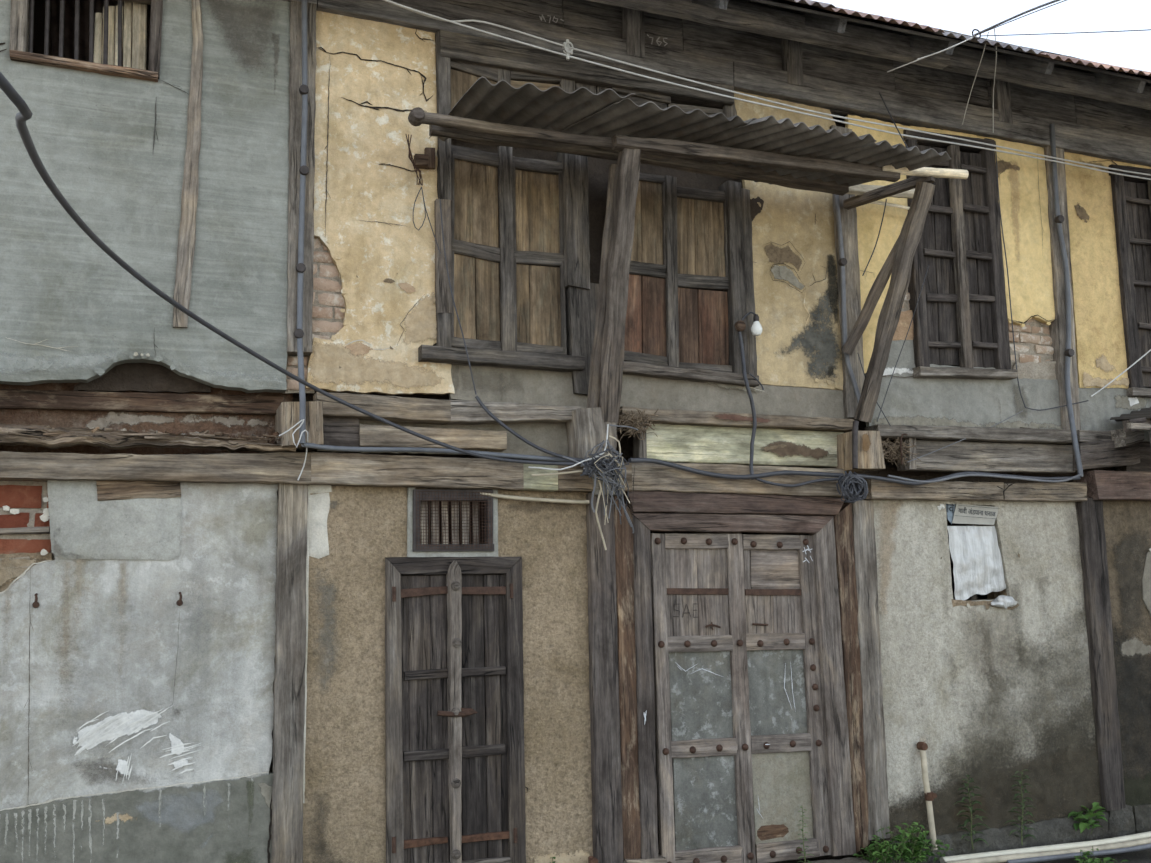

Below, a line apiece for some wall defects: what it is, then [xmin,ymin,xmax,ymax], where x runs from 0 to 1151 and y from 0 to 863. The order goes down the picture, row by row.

crack [316,47,432,234]
peeling [765,241,806,293]
spalling [74,352,211,394]
peeling [283,238,444,394]
spalling [883,290,915,378]
flaking render [1008,314,1056,380]
peeling [100,759,130,776]
peeling [169,733,188,769]
damp [886,608,1102,855]
damp [0,764,273,863]